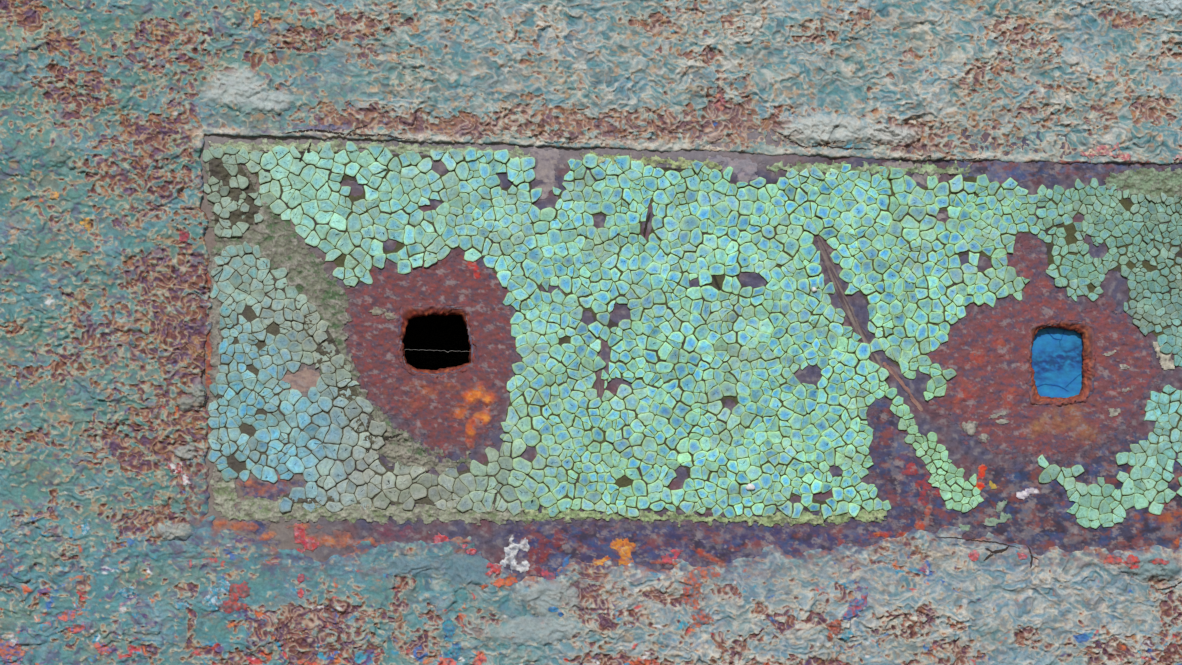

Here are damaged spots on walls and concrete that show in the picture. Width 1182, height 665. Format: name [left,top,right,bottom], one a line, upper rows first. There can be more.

crack [286,125,405,171]
crack [773,130,913,161]
crack [643,212,651,237]
rust [342,249,520,463]
peeling [203,141,1182,529]
rust [921,236,1164,491]
crack [346,433,403,474]
rust [862,462,943,583]
rust [1127,503,1182,548]
rust [650,545,724,566]
rust [868,601,985,665]